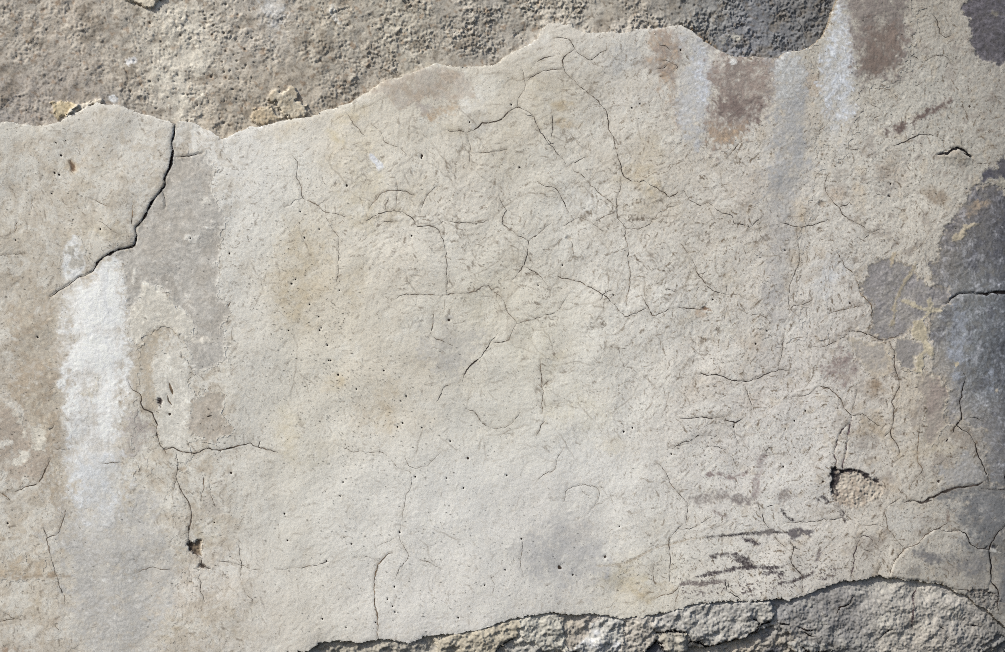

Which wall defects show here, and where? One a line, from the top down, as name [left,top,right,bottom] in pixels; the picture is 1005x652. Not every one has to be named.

crack [50,126,201,297]
leakage [659,25,716,160]
leakage [747,4,863,350]
crack [291,37,1005,636]
peeling [847,154,1005,493]
crack [2,425,65,500]
crack [128,382,275,601]
flaking render [287,634,444,652]
flaking render [551,612,614,652]
flaking render [675,575,1005,652]
spalling [826,465,885,511]
leakage [907,446,1005,620]